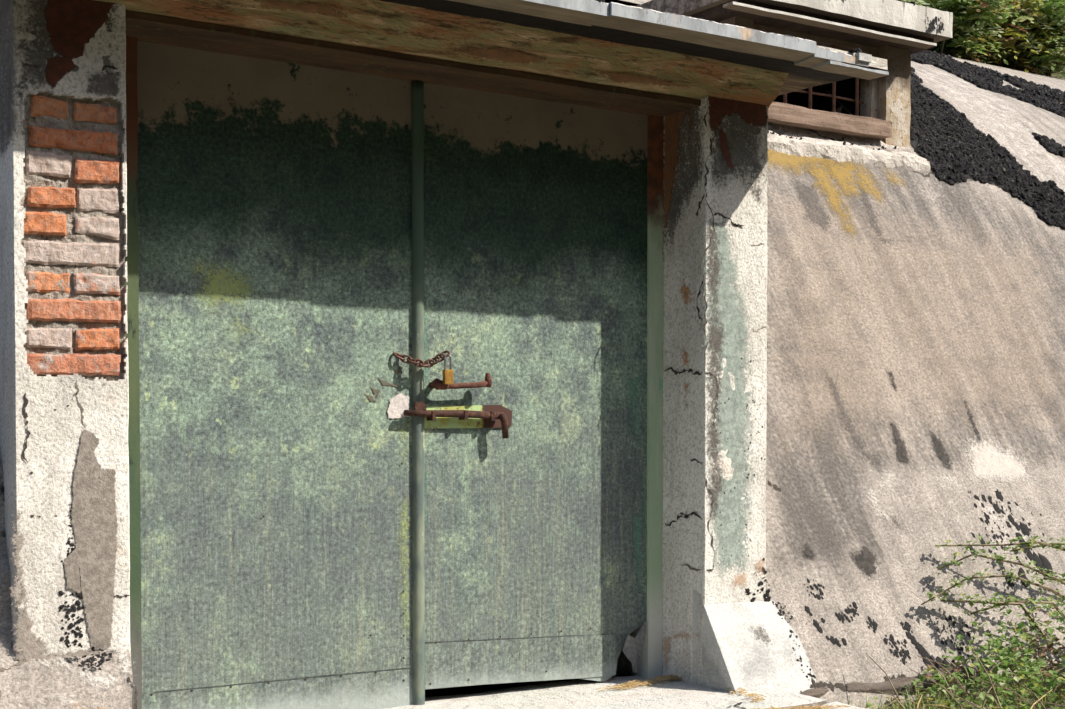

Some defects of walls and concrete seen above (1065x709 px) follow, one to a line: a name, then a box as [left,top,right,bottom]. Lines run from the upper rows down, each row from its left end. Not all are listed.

spalling [21,0,125,381]
crack [664,113,765,427]
water stain [796,183,830,230]
water stain [860,187,891,243]
crack [72,382,85,426]
flaking render [9,430,132,688]
crack [665,458,715,572]